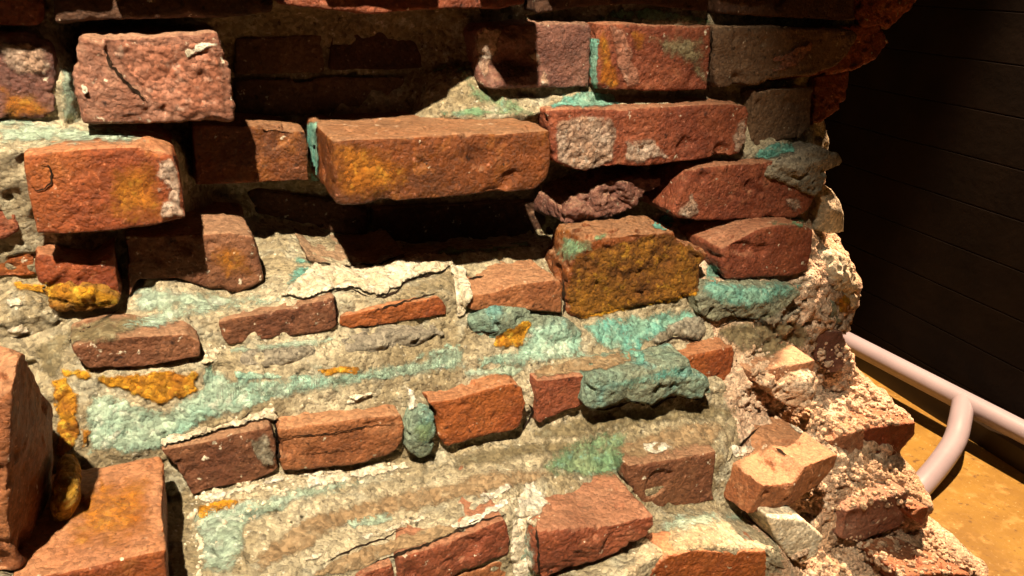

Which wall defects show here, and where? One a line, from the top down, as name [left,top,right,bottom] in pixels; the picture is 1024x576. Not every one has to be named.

crack [104,49,147,102]
peeling [279,252,473,317]
peeling [650,317,706,343]
peeling [755,305,802,327]
crack [321,514,506,565]